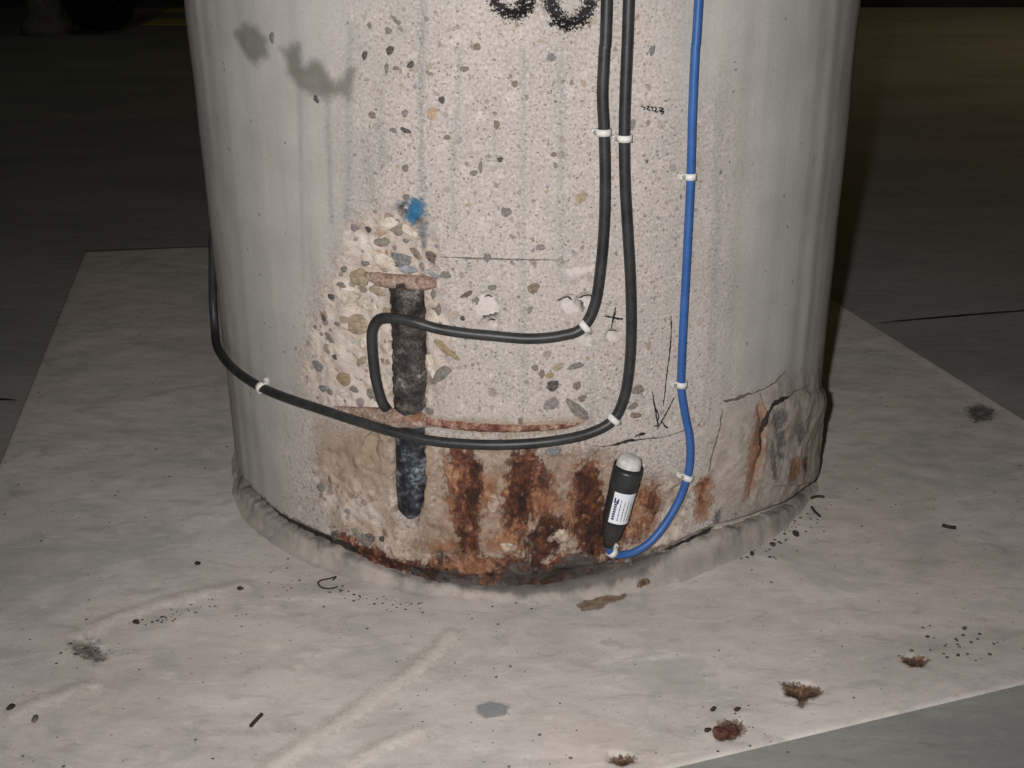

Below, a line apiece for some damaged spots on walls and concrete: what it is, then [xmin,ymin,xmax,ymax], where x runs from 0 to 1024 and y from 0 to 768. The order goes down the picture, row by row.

leakage [237,27,266,60]
leakage [287,50,353,95]
spalling [296,194,696,576]
crack [709,371,809,472]
corrosion [336,445,661,586]
corrosion [694,475,715,522]